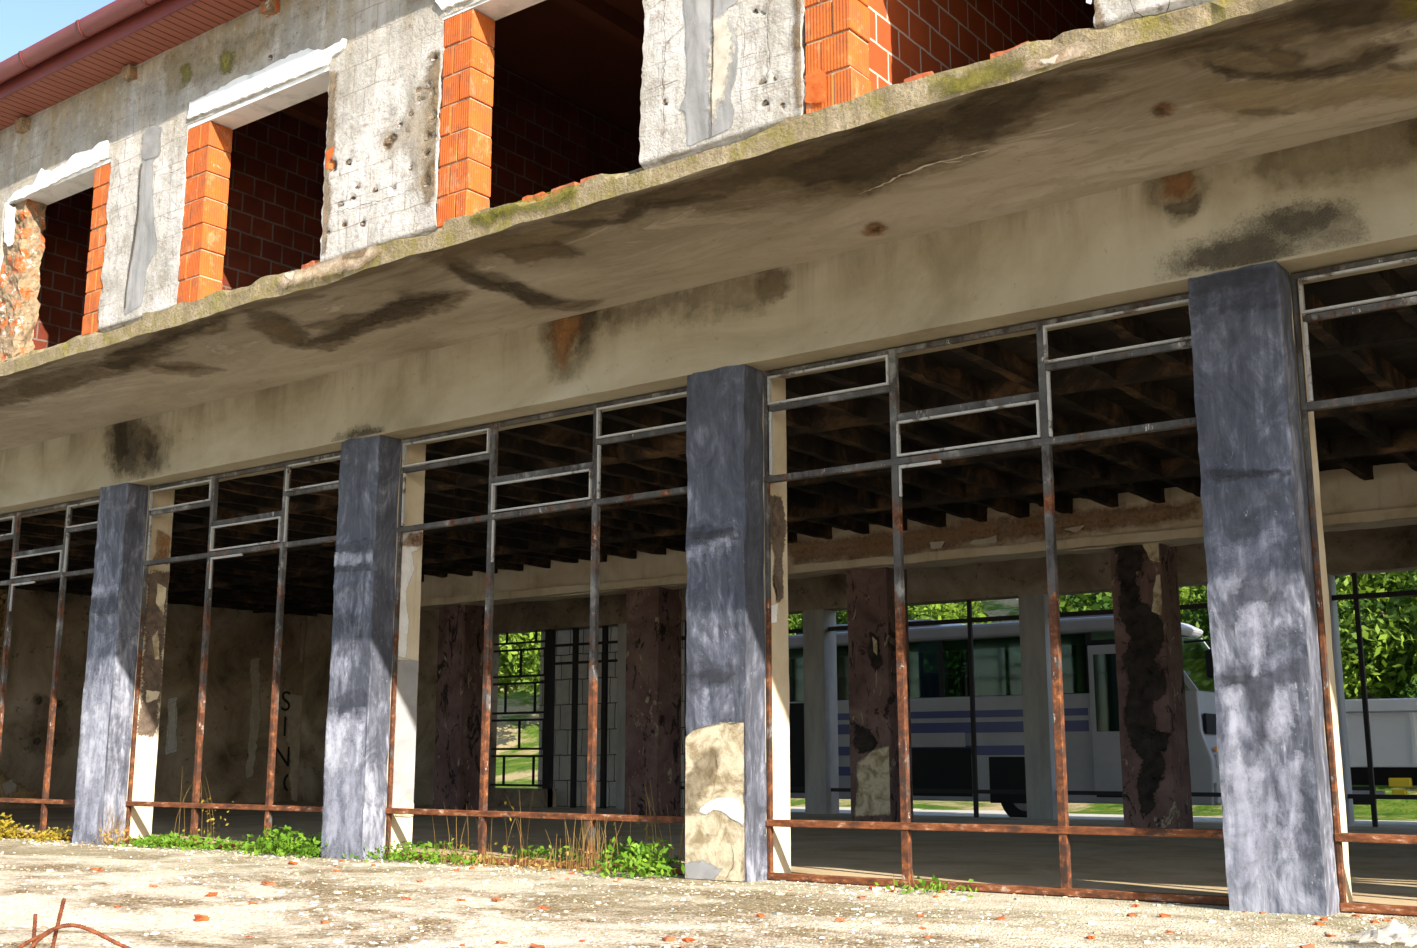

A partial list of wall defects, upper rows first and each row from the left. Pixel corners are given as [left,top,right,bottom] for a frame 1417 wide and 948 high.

water stain [219,52,233,74]
water stain [1174,0,1417,80]
peeling [4,203,16,246]
water stain [497,75,1107,264]
rust [1163,171,1199,214]
water stain [1173,199,1362,276]
water stain [0,316,225,406]
water stain [245,247,596,352]
rust [549,311,595,365]
water stain [110,423,160,474]